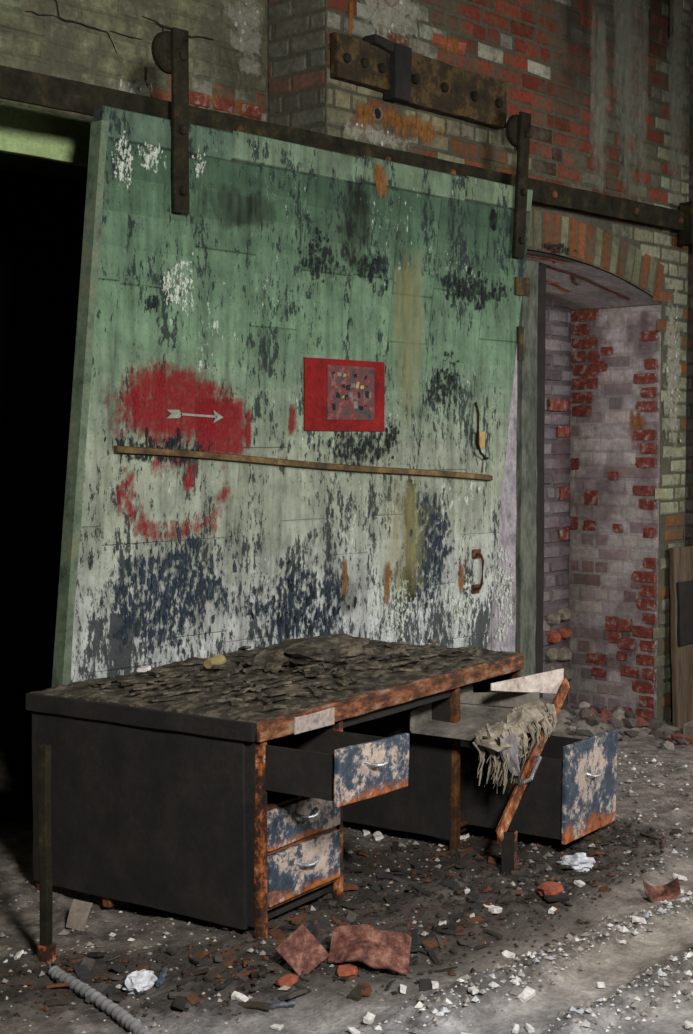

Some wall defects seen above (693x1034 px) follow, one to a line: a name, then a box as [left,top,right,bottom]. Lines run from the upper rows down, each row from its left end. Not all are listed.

crack [25,0,214,53]
rust [355,105,433,142]
peeling [112,130,163,190]
spalling [548,309,613,438]
spalling [632,289,681,468]
spalling [632,485,656,510]
spalling [559,516,596,540]
spalling [643,527,655,538]
peeling [94,492,477,672]
peeling [492,540,515,651]
spalling [586,558,657,720]